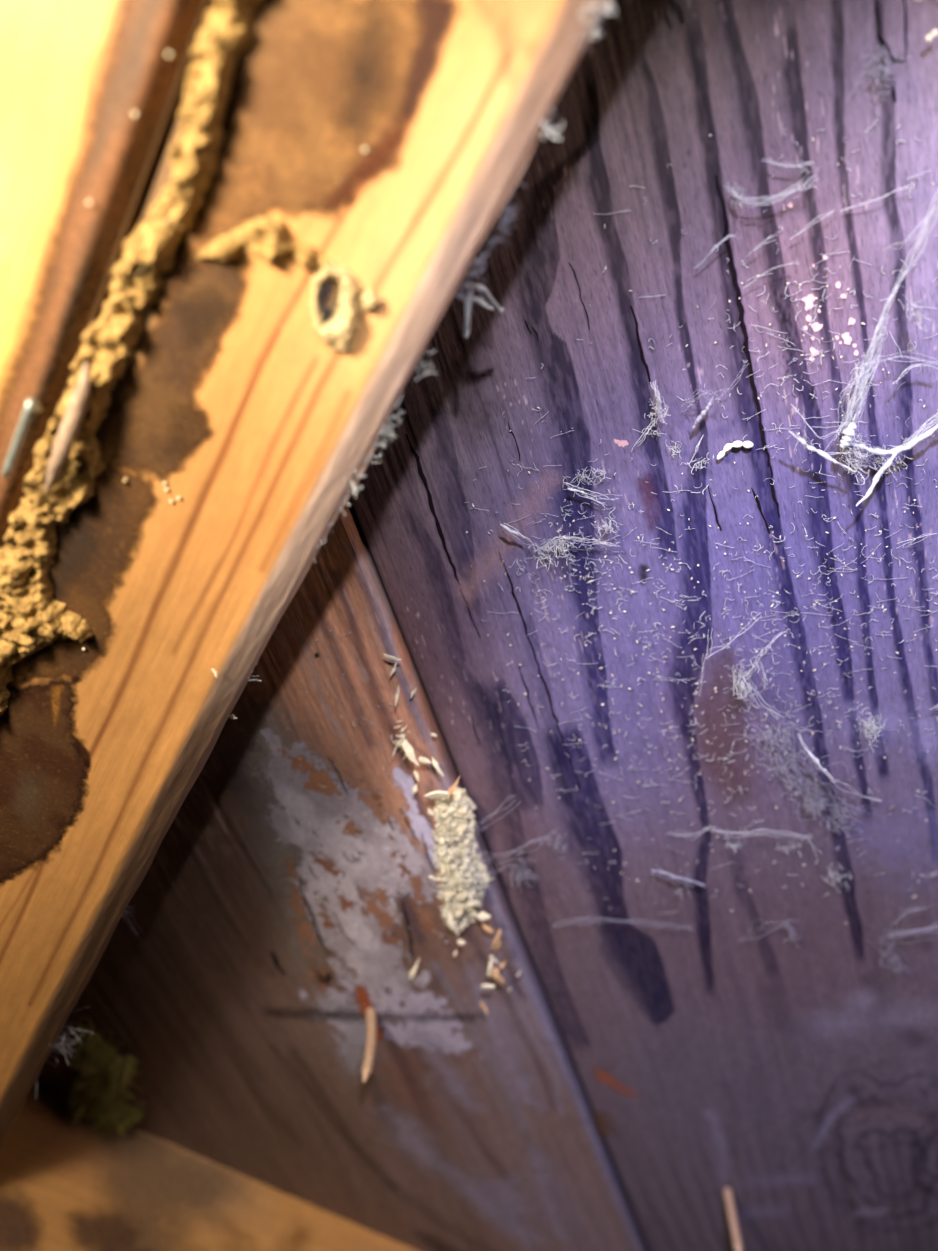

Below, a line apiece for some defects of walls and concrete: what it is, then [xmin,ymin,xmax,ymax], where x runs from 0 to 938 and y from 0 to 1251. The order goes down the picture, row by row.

damp [0,0,453,883]
crack [405,434,481,638]
peeling [277,747,382,838]
peeling [284,834,447,1003]
damp [0,1195,38,1251]